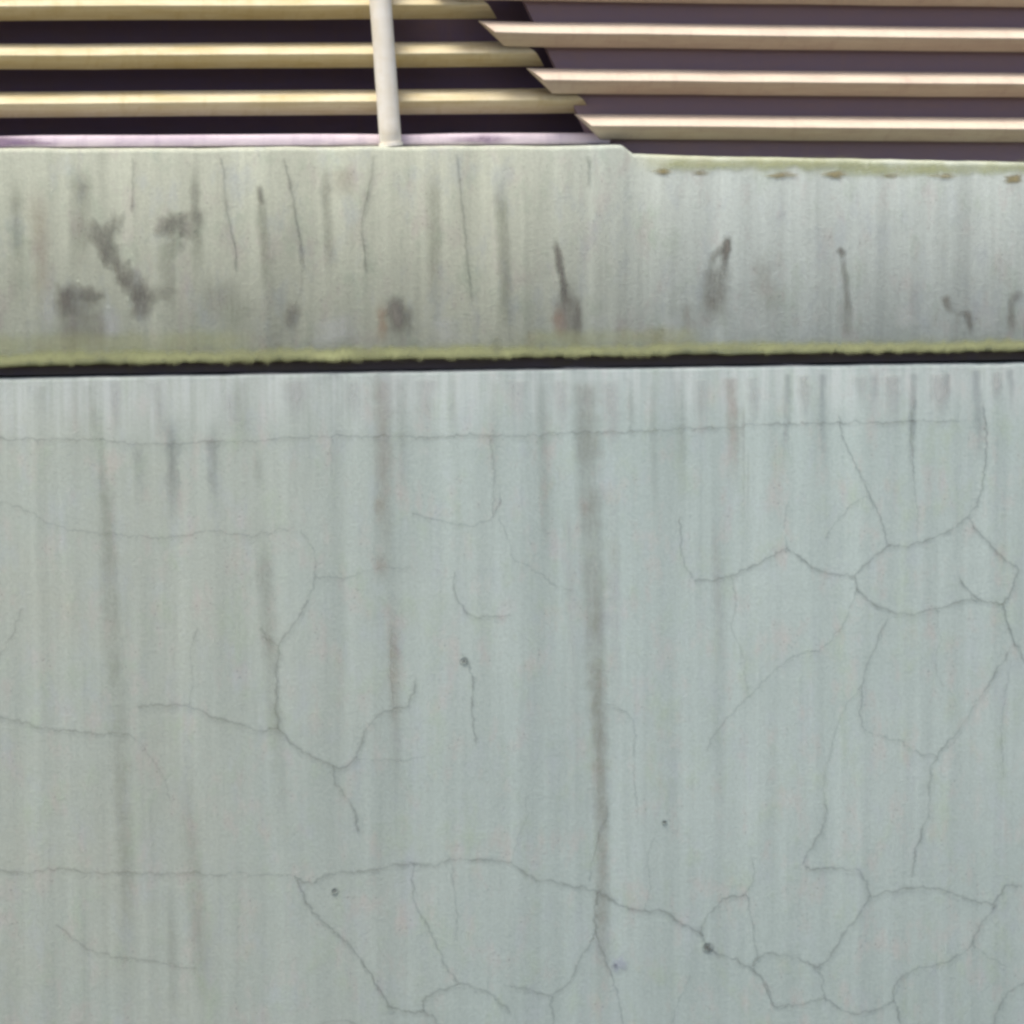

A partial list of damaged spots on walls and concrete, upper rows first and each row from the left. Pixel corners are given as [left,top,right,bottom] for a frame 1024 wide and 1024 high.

water stain [556,247,567,295]
water stain [722,239,730,261]